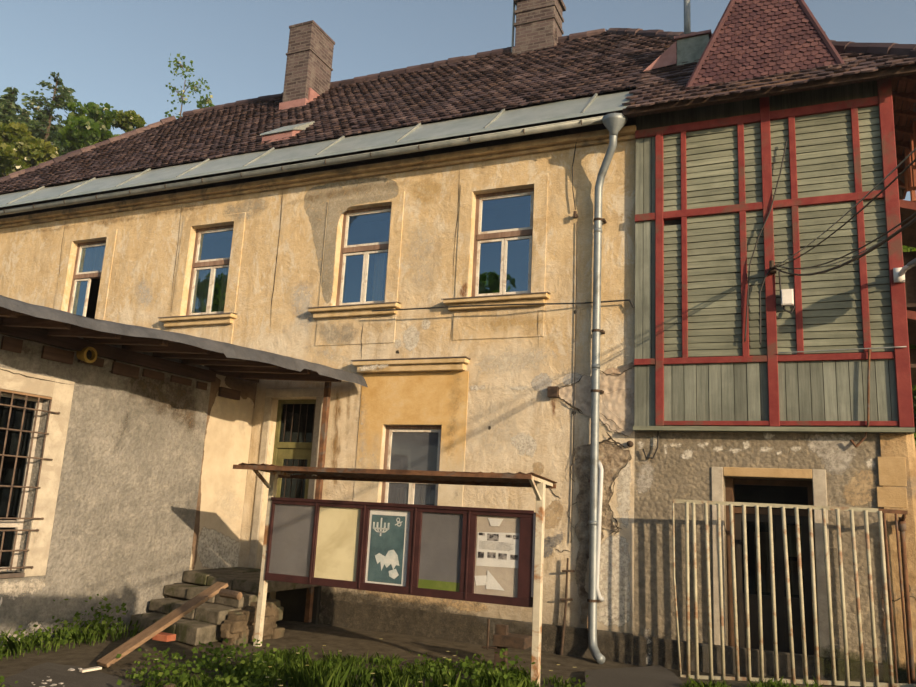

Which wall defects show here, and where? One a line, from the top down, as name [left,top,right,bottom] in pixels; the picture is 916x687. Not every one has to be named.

crack [270,193,283,326]
crack [570,406,629,449]
flaking render [511,362,750,626]
flaking render [761,432,801,455]